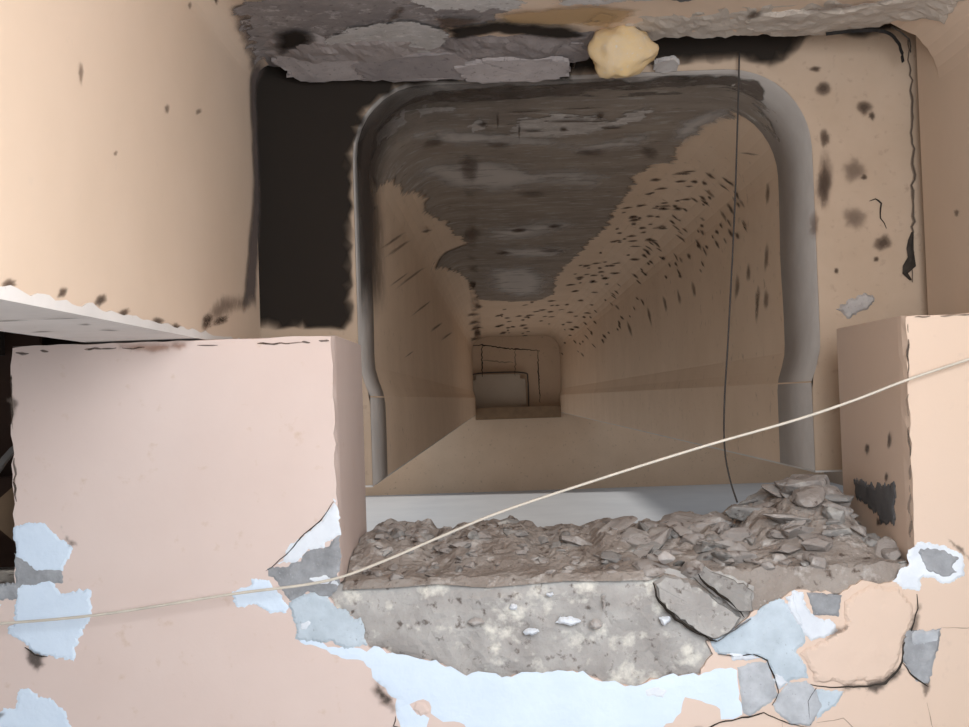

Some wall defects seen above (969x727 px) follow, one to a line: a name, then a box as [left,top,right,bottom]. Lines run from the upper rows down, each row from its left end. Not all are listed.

leakage [649,34,807,64]
peeling [625,0,964,41]
leakage [240,16,605,329]
peeling [233,0,780,302]
leakage [613,171,746,283]
leakage [820,171,829,199]
crack [826,26,916,282]
leakage [870,198,889,261]
flaking render [893,394,965,591]
peeling [0,522,92,668]
spalling [232,498,846,727]
crack [710,712,843,727]